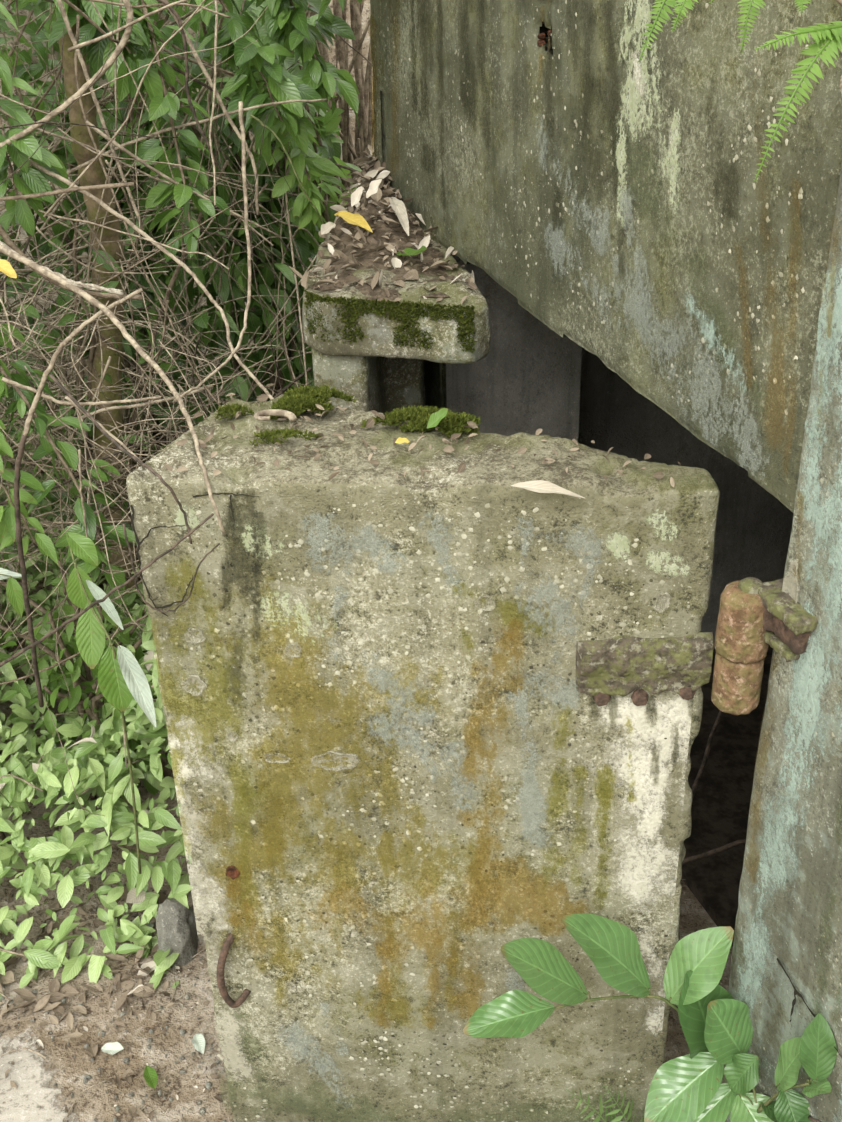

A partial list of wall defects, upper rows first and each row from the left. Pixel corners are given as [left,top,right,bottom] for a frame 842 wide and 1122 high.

leakage [686,293,746,392]
crack [777,958,816,1022]